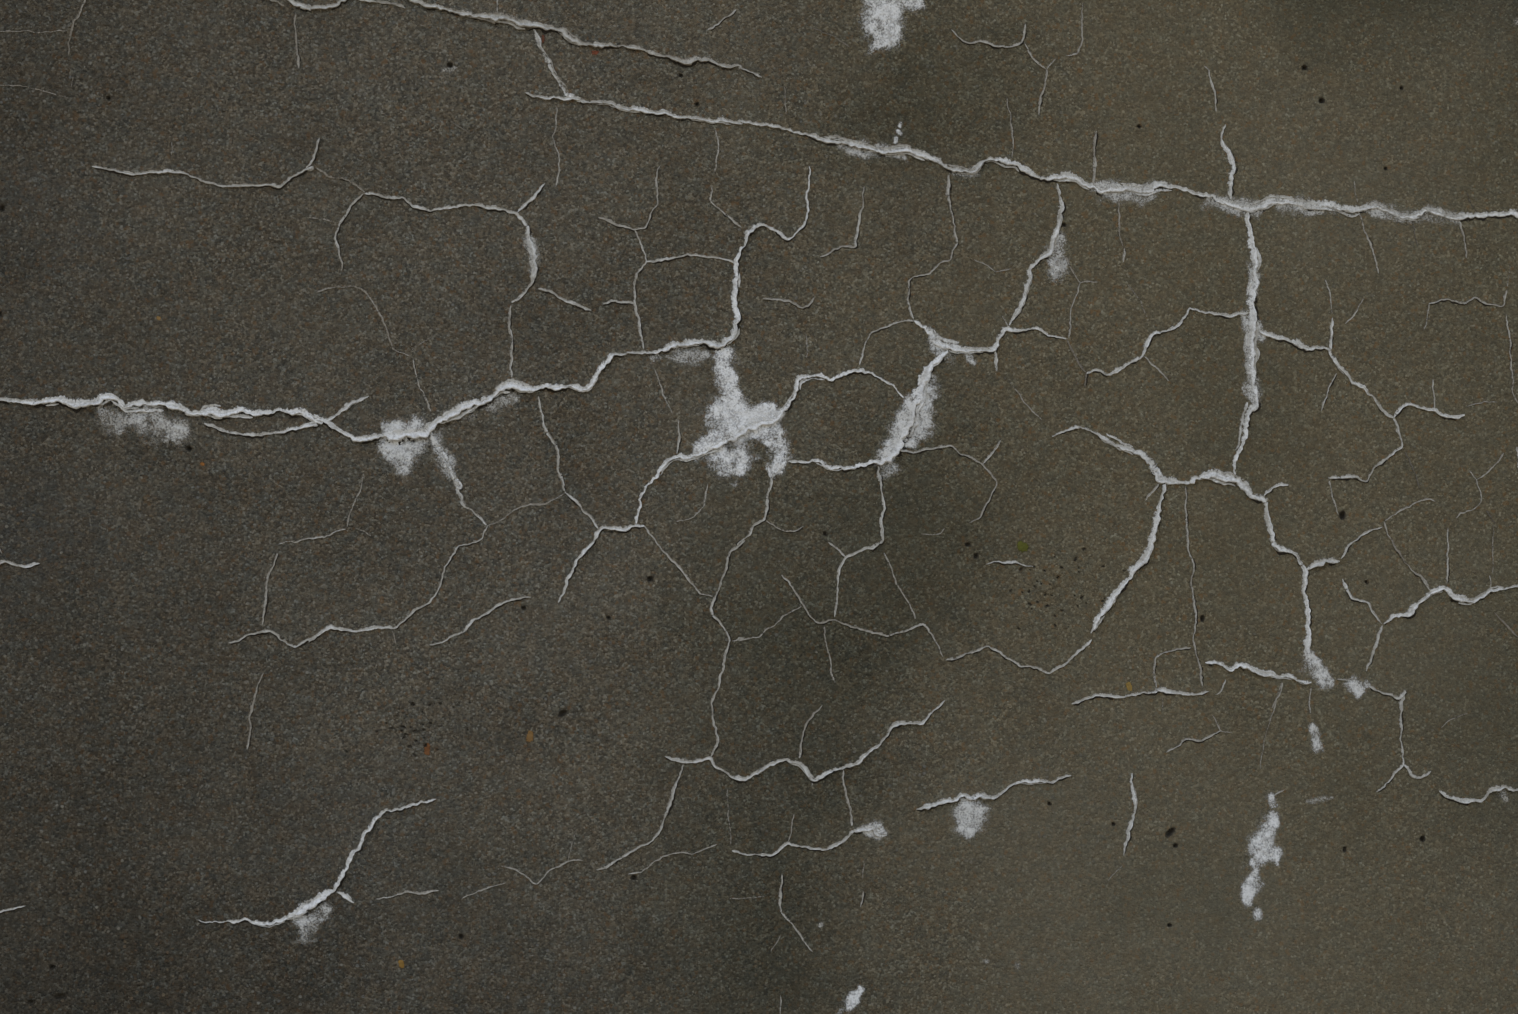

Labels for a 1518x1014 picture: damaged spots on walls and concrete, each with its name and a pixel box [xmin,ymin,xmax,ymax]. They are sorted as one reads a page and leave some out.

crack [270,0,348,68]
crack [92,138,545,303]
crack [409,0,1518,686]
crack [0,165,945,874]
crack [1071,646,1209,706]
crack [1205,660,1312,769]
crack [1369,686,1431,792]
crack [199,799,439,928]
crack [728,875,813,952]
crack [916,775,1071,812]
crack [1108,774,1138,881]
crack [1439,784,1518,806]